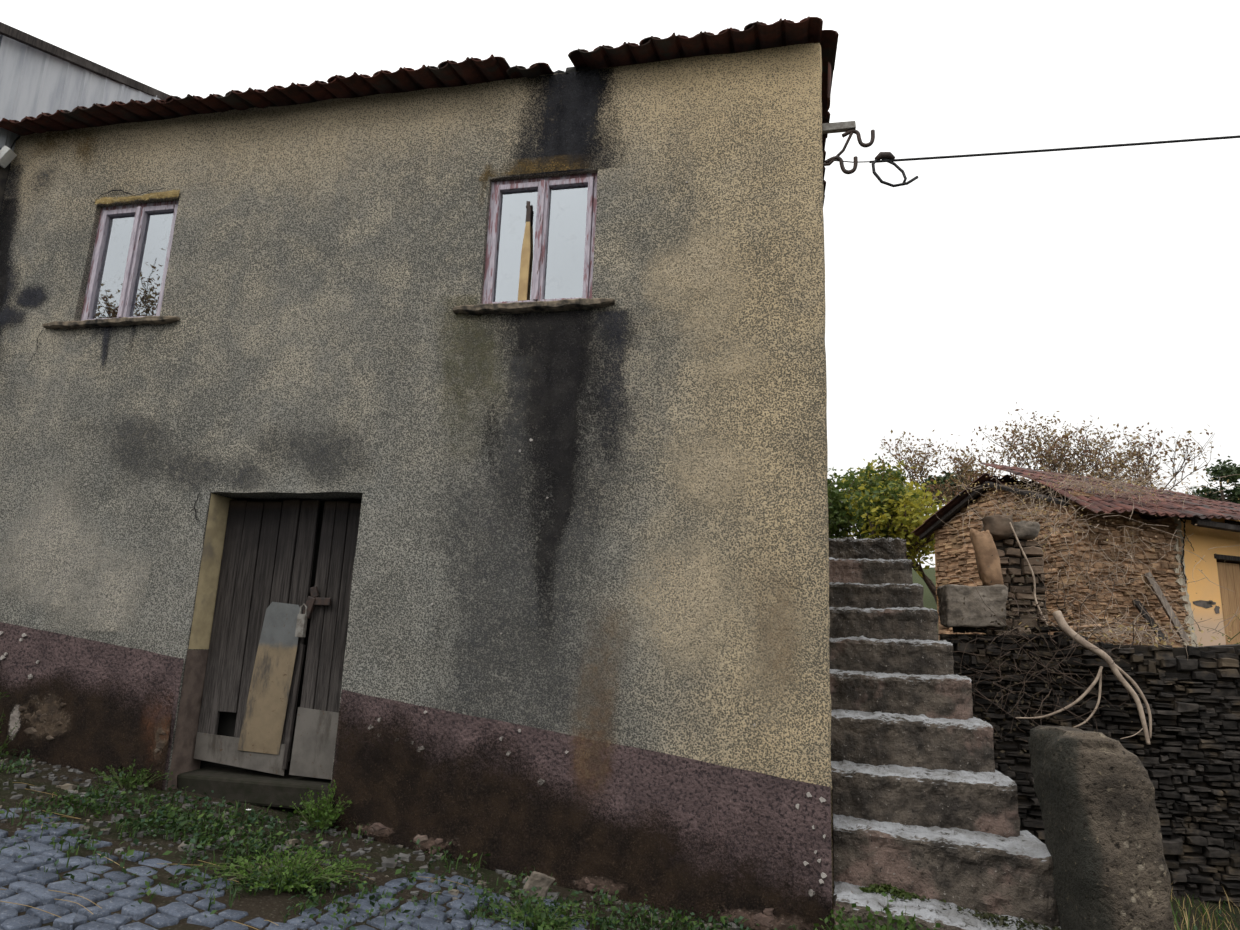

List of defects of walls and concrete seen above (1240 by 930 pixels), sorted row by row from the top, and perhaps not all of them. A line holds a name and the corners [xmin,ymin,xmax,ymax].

water stain [555,69,607,172]
water stain [0,165,55,360]
water stain [652,232,733,299]
water stain [93,325,137,367]
water stain [3,488,145,632]
water stain [327,308,832,930]
flaking render [9,693,71,741]
water stain [0,666,175,790]